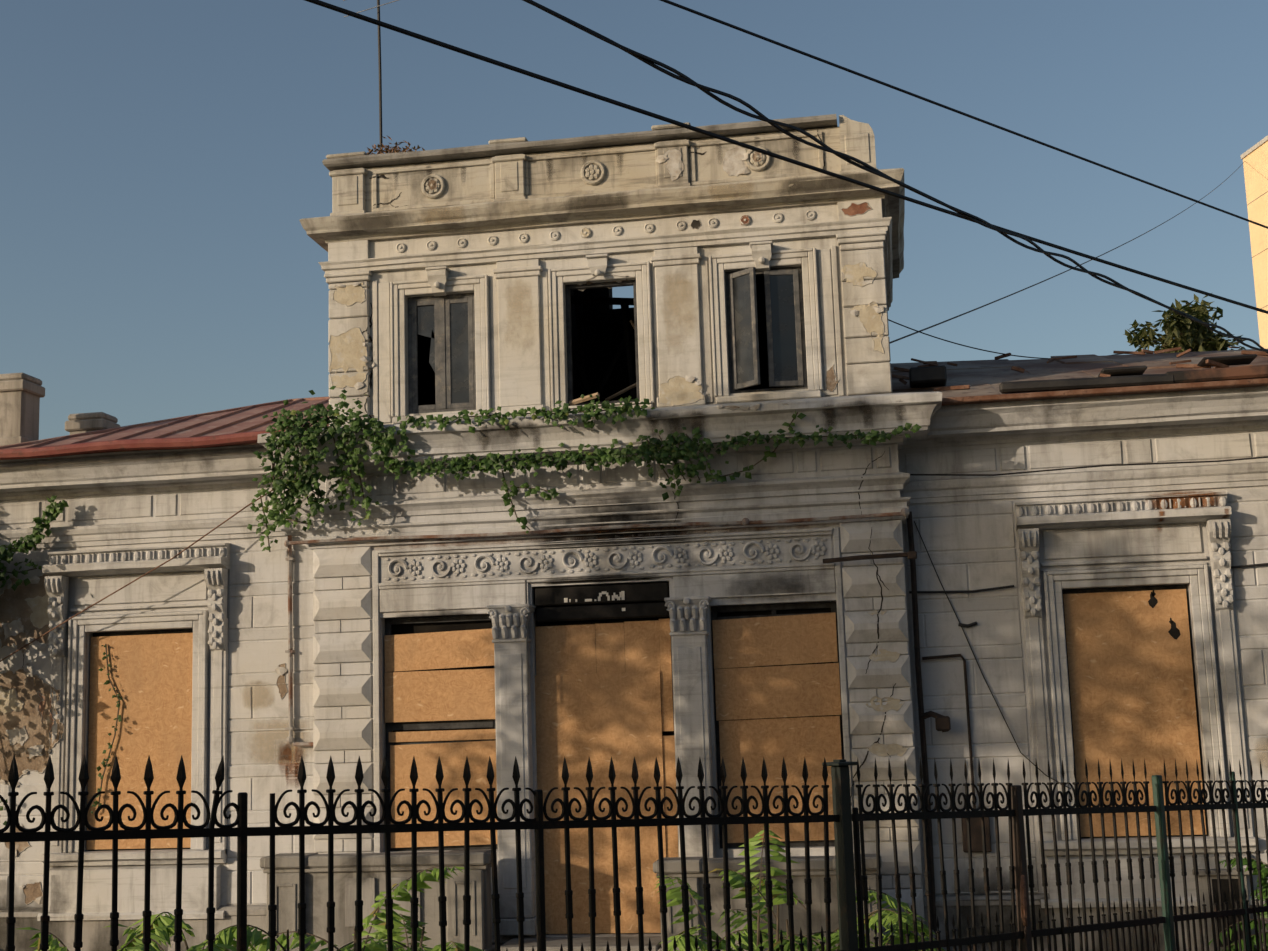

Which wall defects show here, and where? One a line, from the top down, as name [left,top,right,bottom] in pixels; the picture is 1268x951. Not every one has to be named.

flaking render [333,282,366,307]
flaking render [329,327,375,389]
flaking render [850,301,885,354]
crack [851,451,896,796]
flaking render [0,573,66,787]